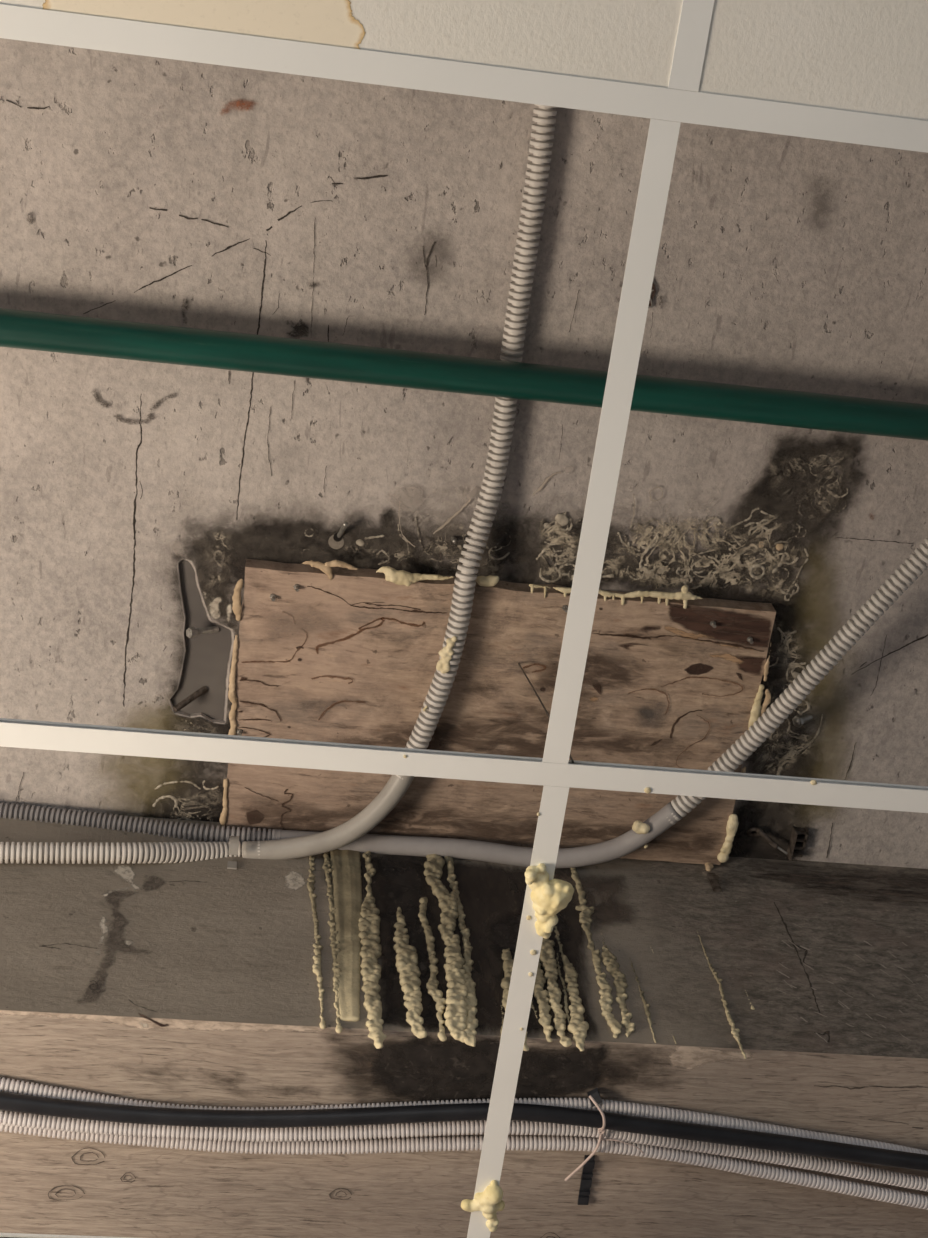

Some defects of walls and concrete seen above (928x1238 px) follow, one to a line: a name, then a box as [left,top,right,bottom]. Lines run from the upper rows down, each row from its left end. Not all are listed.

water stain [42,0,366,49]
crack [228,371,295,520]
crack [123,397,143,706]
water stain [173,510,583,638]
water stain [600,436,863,710]
crack [837,536,913,544]
water stain [118,756,228,822]
water stain [141,611,425,735]
water stain [426,713,550,757]
water stain [729,800,821,861]
water stain [749,670,842,778]
crack [851,634,928,695]